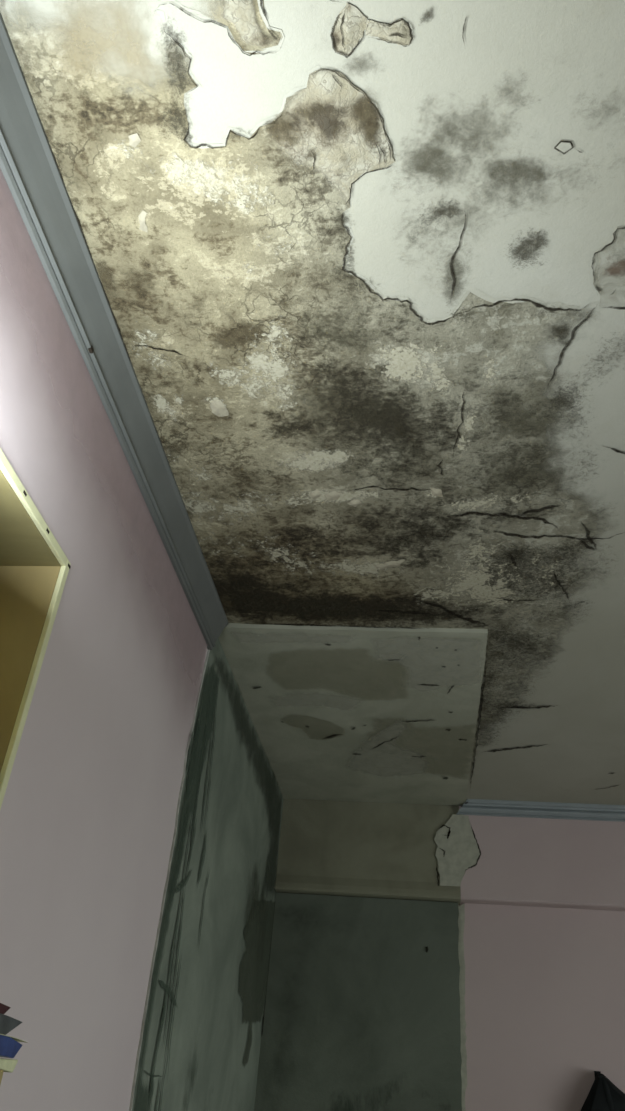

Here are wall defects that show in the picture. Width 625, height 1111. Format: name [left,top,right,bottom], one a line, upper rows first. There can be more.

water stain [167,28,190,95]
water stain [163,109,191,142]
water stain [422,200,459,221]
water stain [512,232,547,262]
peeling [591,225,625,295]
water stain [552,326,568,344]
peeling [3,0,605,745]
crack [449,505,622,566]
water stain [473,540,589,600]
water stain [0,169,282,1111]
peeling [129,638,462,1111]
peeling [434,814,481,887]